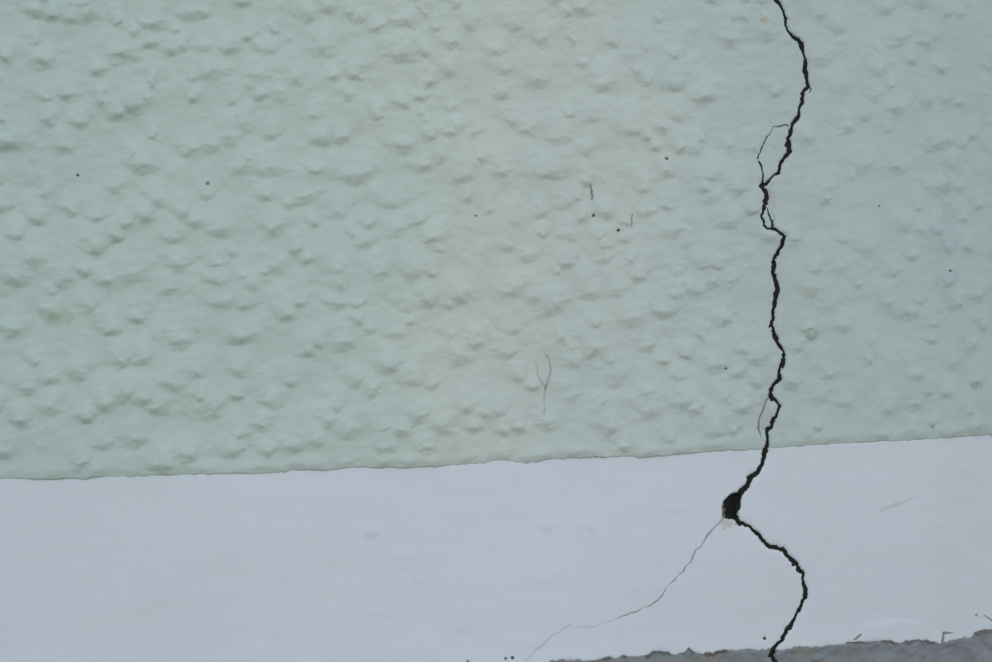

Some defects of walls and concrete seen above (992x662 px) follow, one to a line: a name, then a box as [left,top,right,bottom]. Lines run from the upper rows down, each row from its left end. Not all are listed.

crack [526,0,812,662]